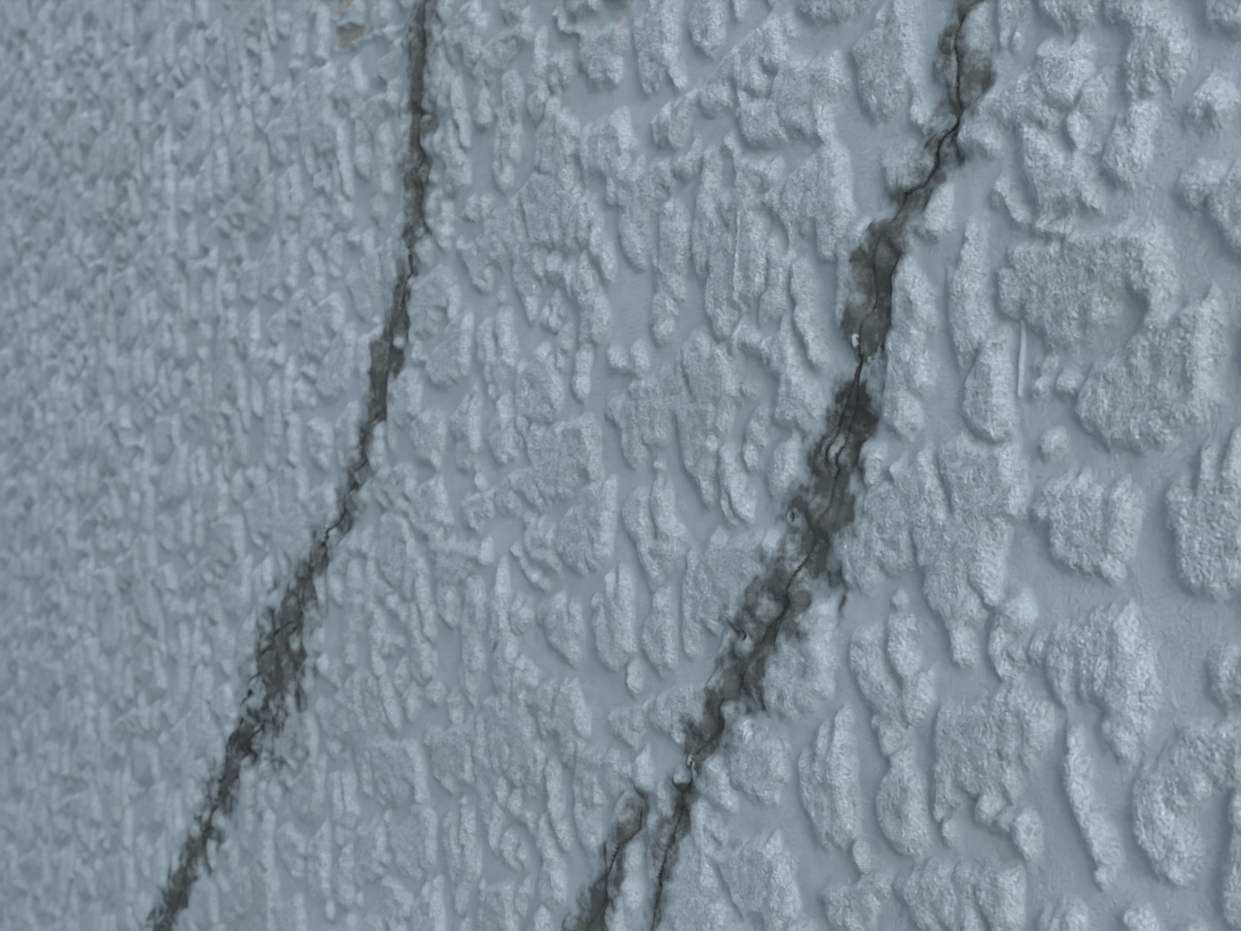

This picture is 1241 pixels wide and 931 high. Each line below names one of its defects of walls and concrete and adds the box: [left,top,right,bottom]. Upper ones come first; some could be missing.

crack [955,17,965,87]
crack [892,120,960,220]
crack [392,225,414,334]
crack [823,297,878,475]
crack [763,558,807,637]
crack [164,463,366,921]
crack [653,857,665,925]